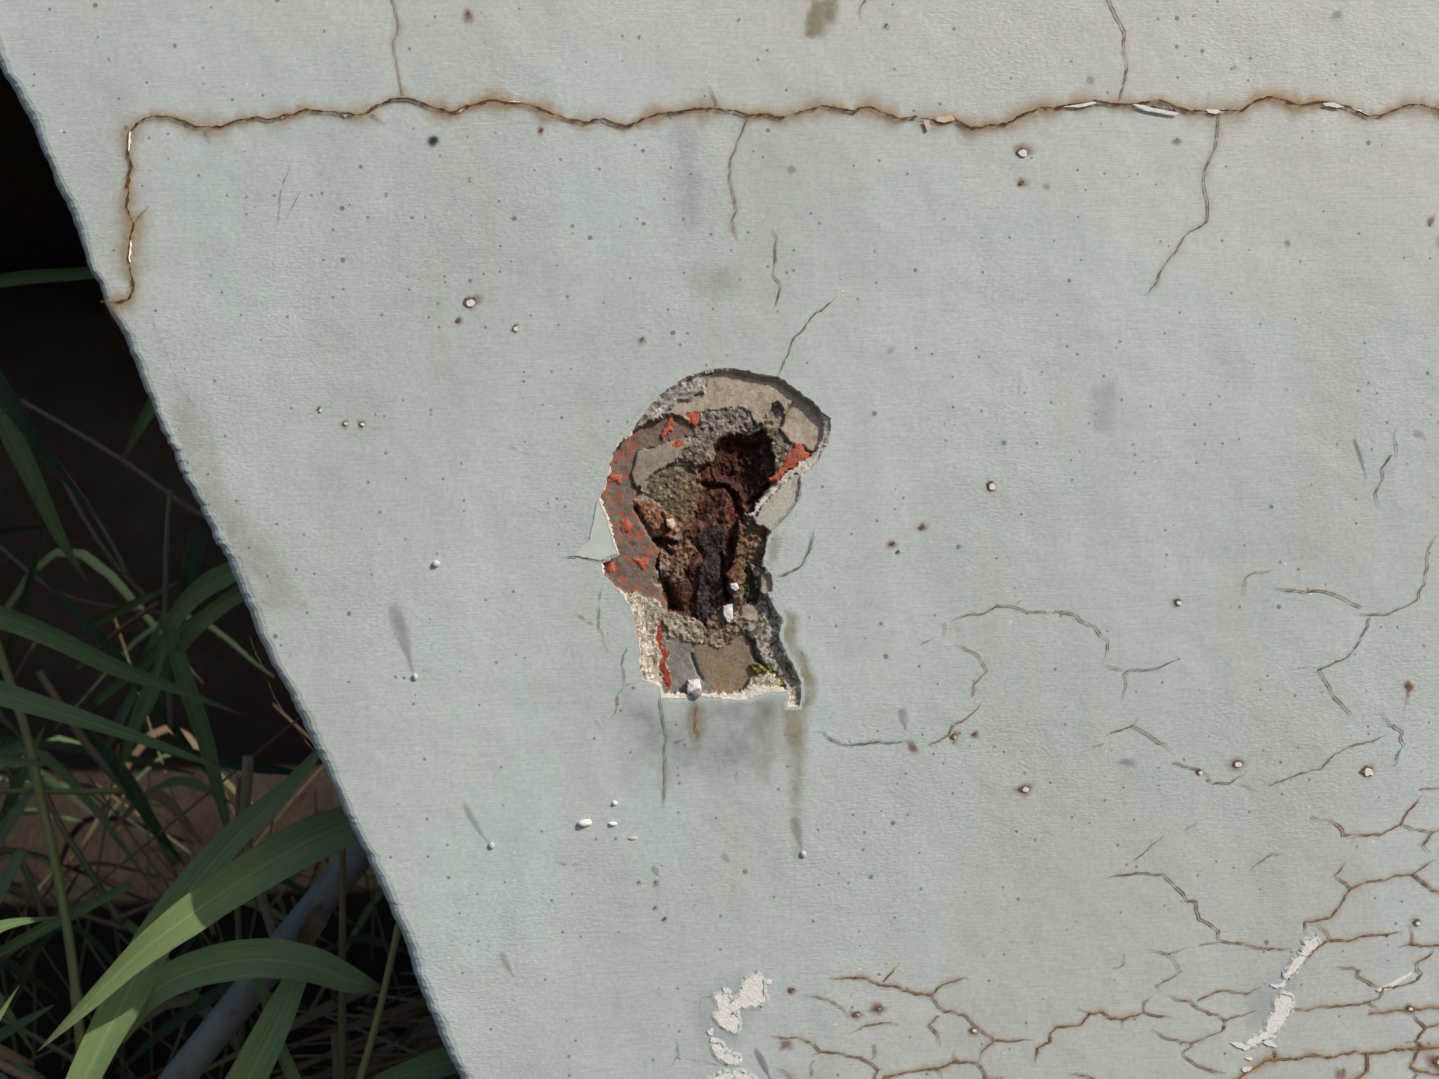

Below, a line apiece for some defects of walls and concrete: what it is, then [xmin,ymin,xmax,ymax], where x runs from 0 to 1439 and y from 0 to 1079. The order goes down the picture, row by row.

crack [100,0,1439,306]
crack [779,298,835,374]
spalling [575,368,831,707]
crack [784,536,1436,791]
peeling [705,970,772,1079]
crack [773,788,1439,1079]
peeling [1231,934,1322,1073]